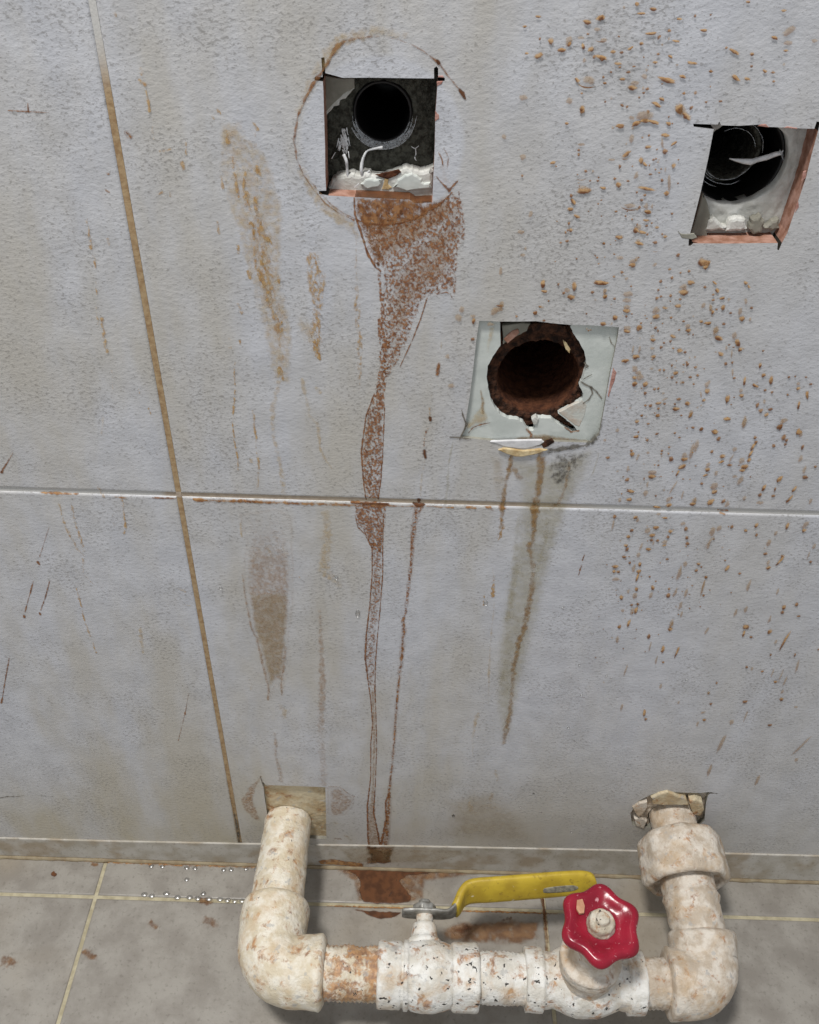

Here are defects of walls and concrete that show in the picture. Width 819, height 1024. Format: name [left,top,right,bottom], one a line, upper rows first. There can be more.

peeling [502,321,570,353]
spalling [490,438,554,457]
corrosion [319,169,464,919]
spalling [632,790,704,829]